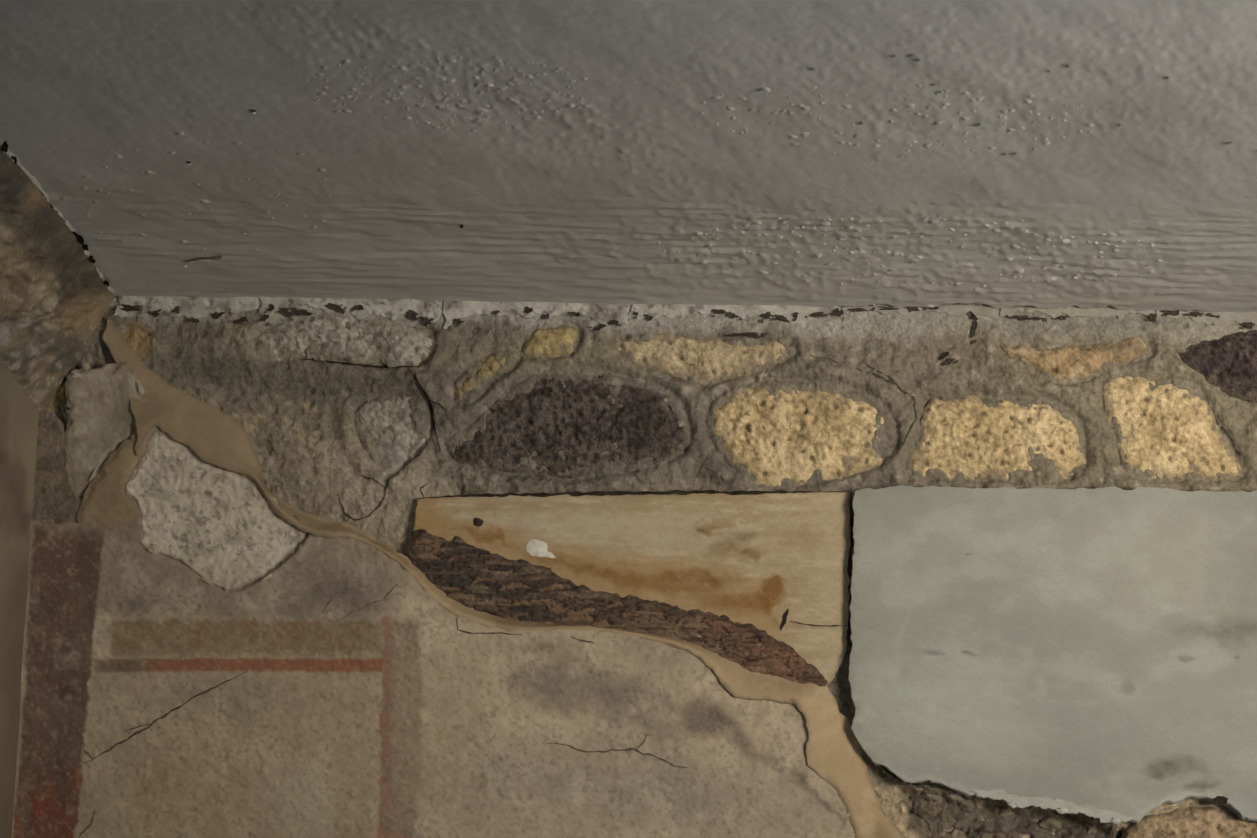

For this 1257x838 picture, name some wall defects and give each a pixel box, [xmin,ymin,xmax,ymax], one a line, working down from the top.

spalling [31,362,151,525]
spalling [126,431,307,593]
crack [299,358,854,677]
crack [83,671,248,764]
spalling [910,784,1133,838]